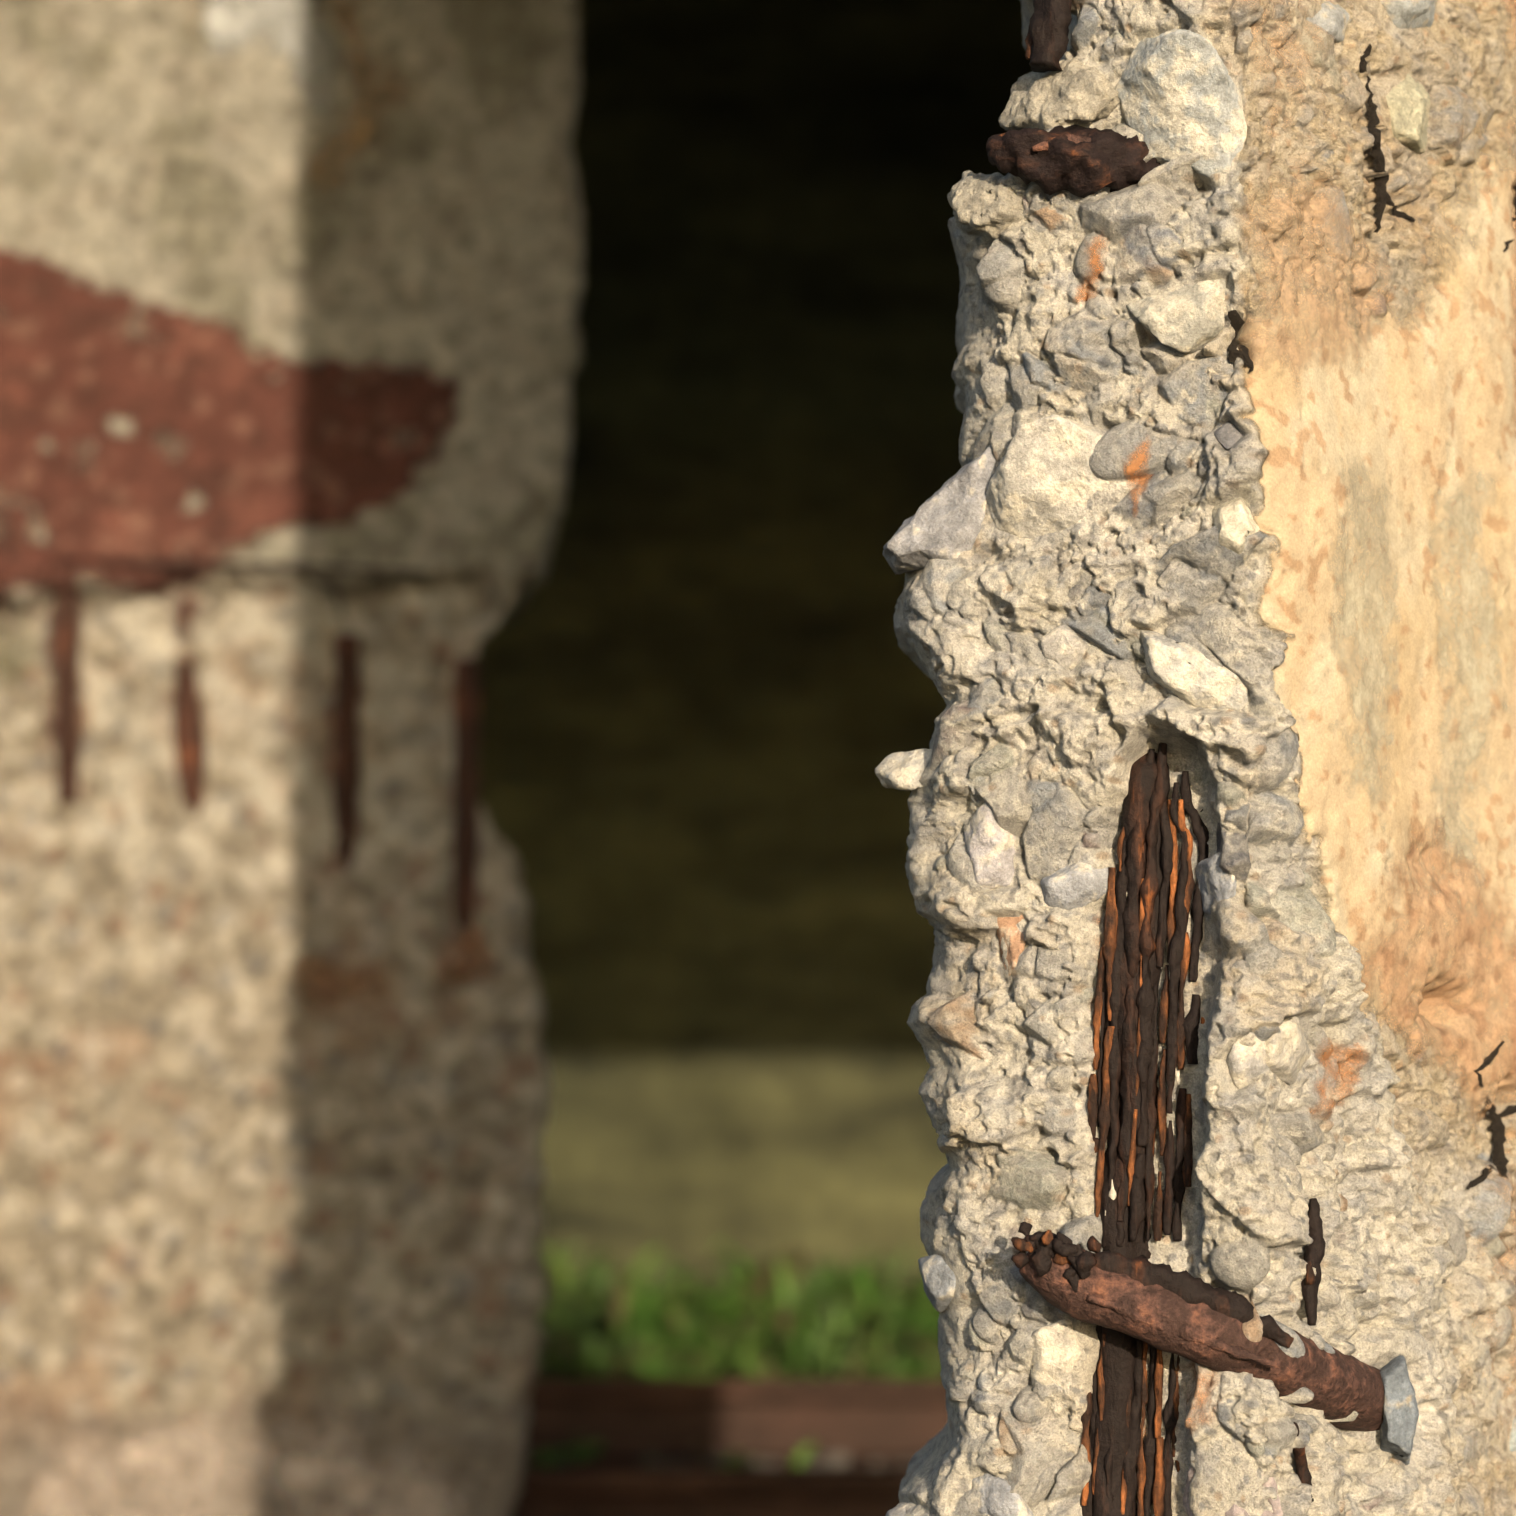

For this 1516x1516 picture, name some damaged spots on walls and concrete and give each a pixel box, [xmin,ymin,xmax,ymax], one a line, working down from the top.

crack [1359,44,1415,233]
rust [0,249,461,684]
spalling [875,0,1516,1516]
crack [1466,1040,1516,1191]